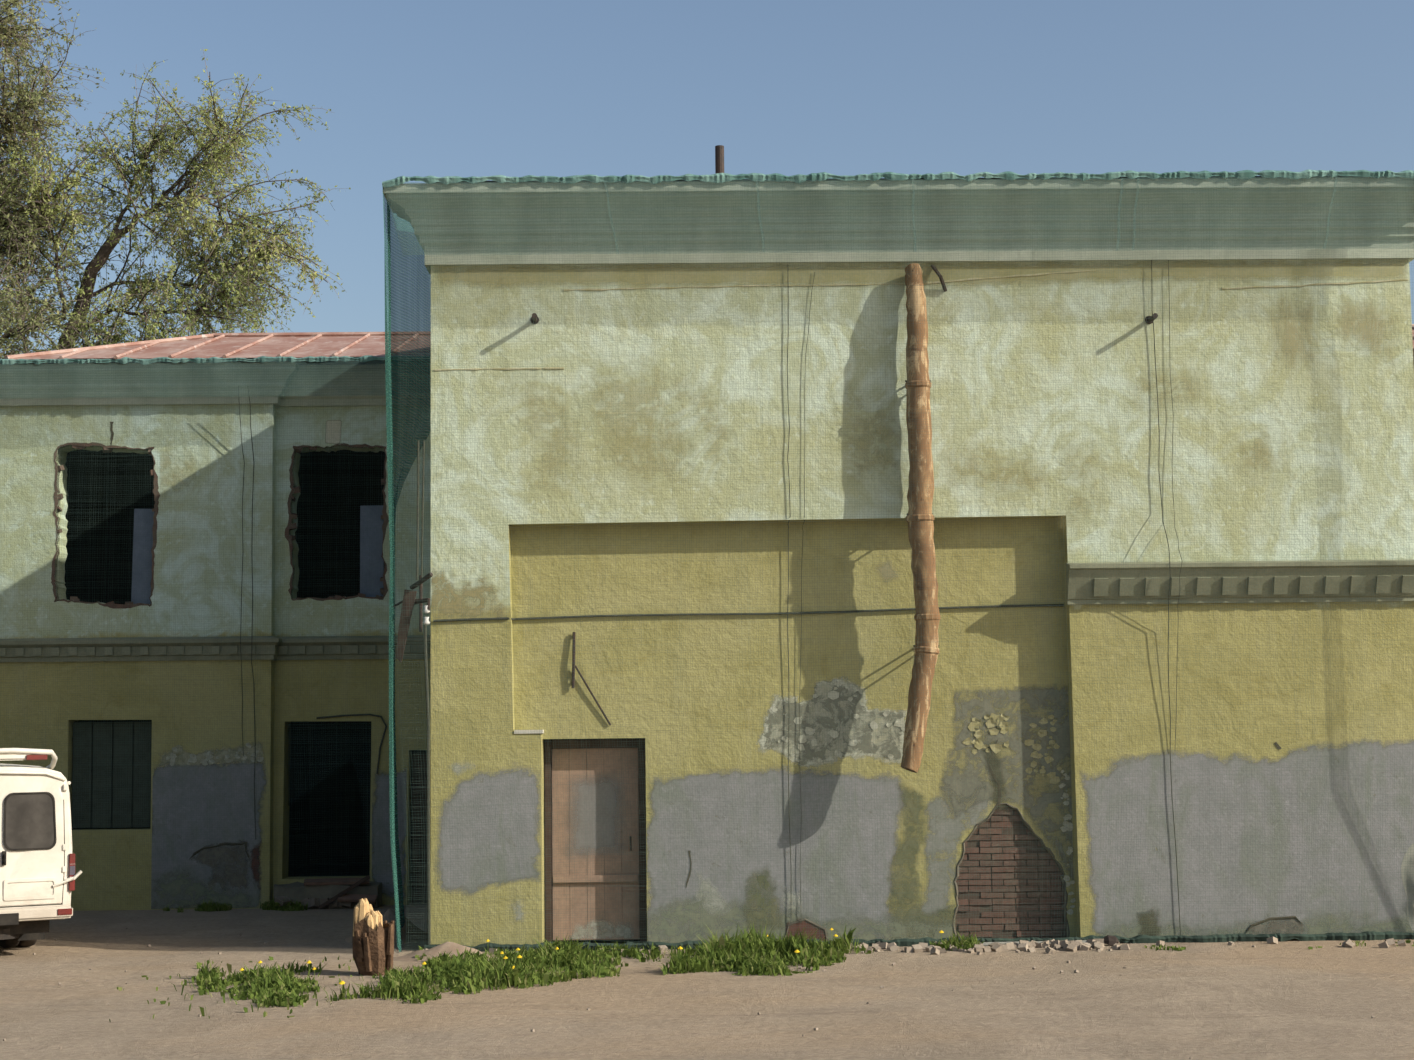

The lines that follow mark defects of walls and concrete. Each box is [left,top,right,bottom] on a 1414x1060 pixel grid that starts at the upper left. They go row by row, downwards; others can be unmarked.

peeling [758,678,906,766]
spalling [952,803,1070,939]
spalling [785,918,827,942]
spalling [1244,916,1303,935]